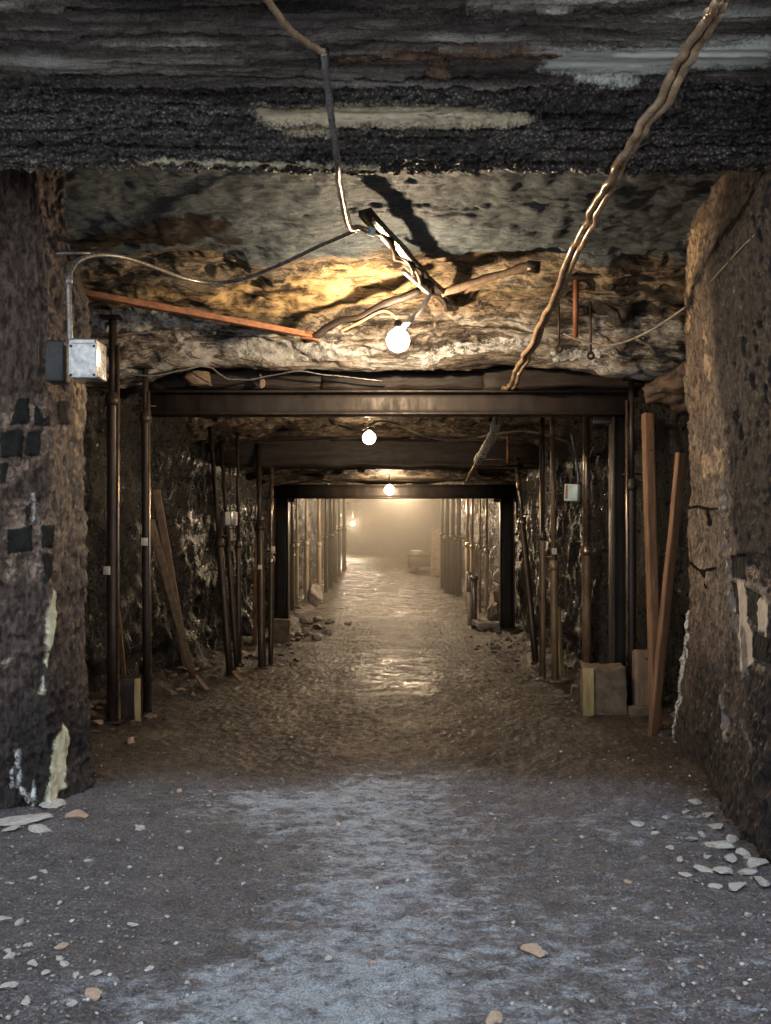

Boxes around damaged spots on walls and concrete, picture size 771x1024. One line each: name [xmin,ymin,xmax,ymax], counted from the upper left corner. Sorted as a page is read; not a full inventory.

crack [688,505,718,526]
crack [689,561,717,589]
flaking render [727,554,771,672]
spalling [10,724,70,807]